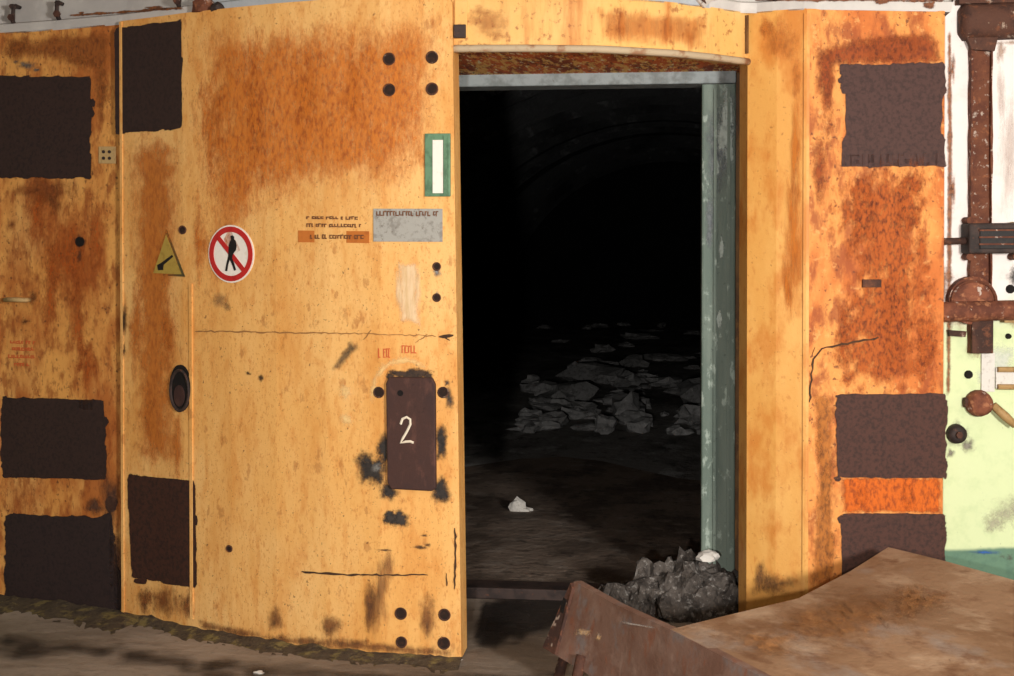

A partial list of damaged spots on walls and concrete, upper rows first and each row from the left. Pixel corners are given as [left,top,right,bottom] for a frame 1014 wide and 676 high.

corrosion [7,35,106,118]
corrosion [203,36,426,245]
corrosion [814,144,825,197]
corrosion [818,34,955,392]
corrosion [129,144,180,465]
corrosion [812,397,835,582]
corrosion [844,477,940,513]
corrosion [140,591,190,614]
leakage [1,637,111,658]
leakage [124,651,191,667]
leakage [204,660,236,676]
leakage [249,668,275,676]